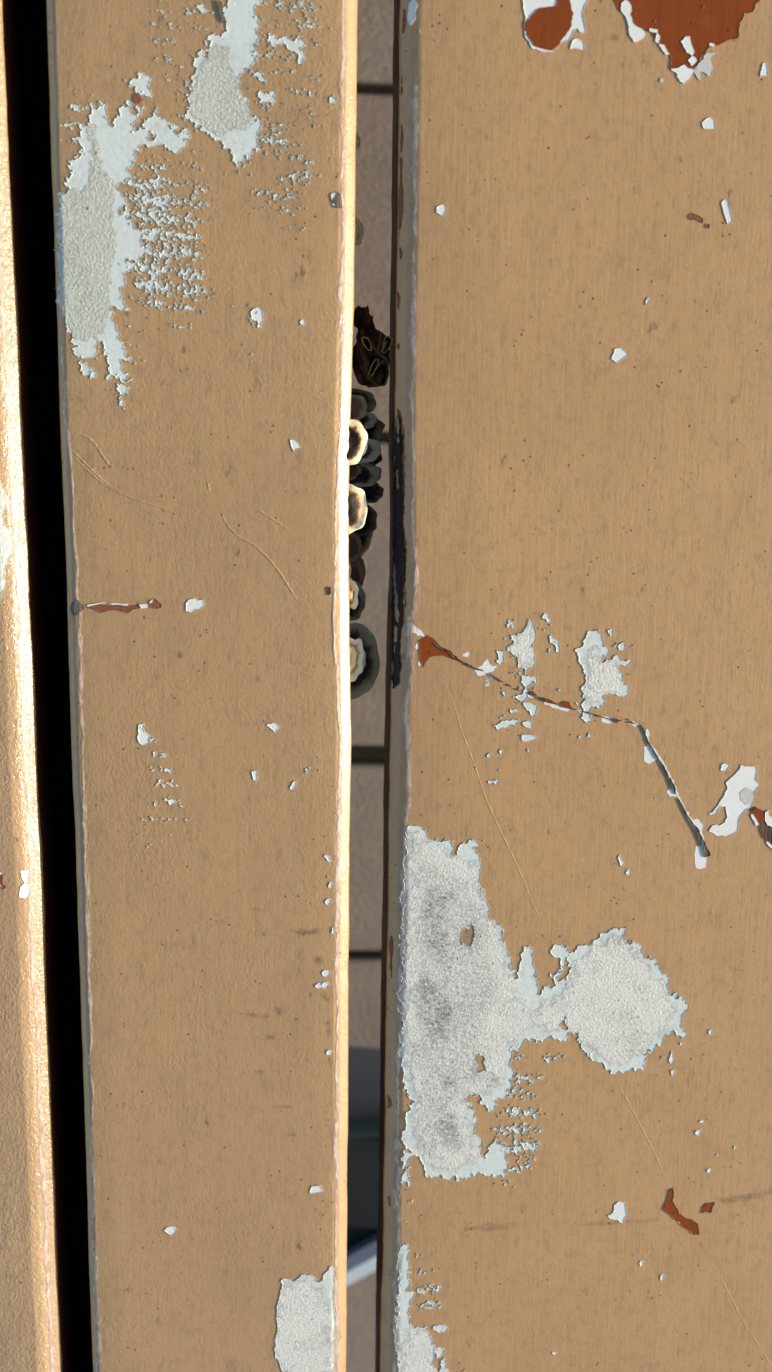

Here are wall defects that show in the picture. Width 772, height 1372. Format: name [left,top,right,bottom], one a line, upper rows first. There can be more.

peeling [523,0,588,52]
peeling [615,0,760,84]
peeling [53,0,342,410]
peeling [0,480,13,601]
peeling [487,613,634,752]
crack [412,623,711,869]
peeling [709,763,760,836]
crack [751,807,772,848]
peeling [387,825,689,1224]
peeling [663,1188,715,1235]
peeling [274,1266,339,1372]
peeling [393,1244,465,1372]